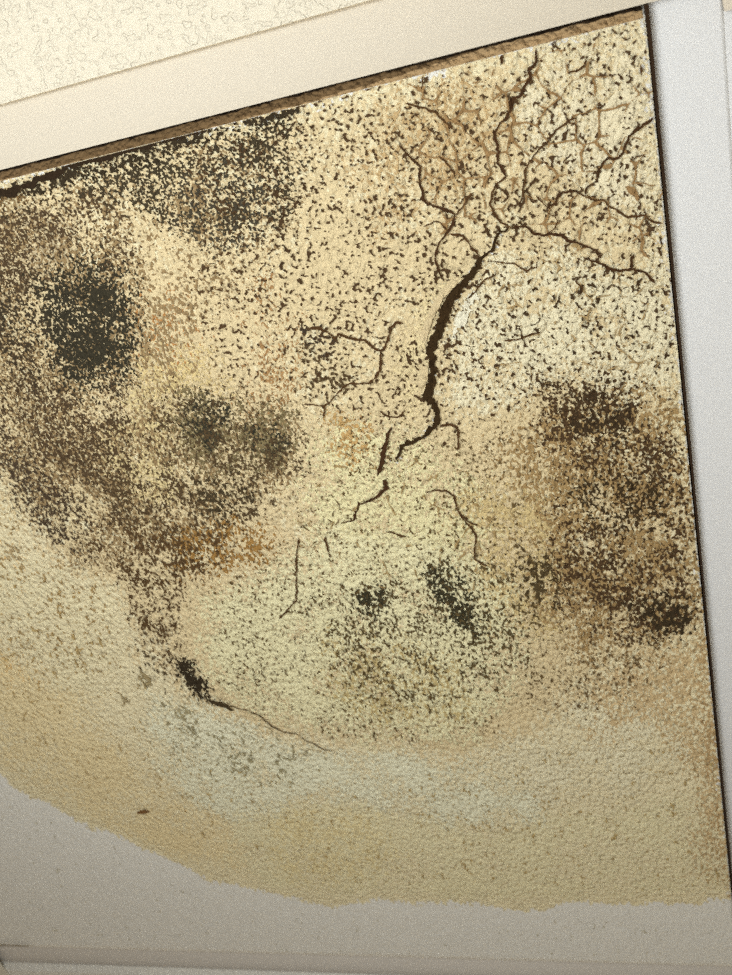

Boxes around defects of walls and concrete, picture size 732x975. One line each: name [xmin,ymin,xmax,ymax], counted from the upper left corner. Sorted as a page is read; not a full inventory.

crack [279,43,667,619]
crack [229,706,334,752]